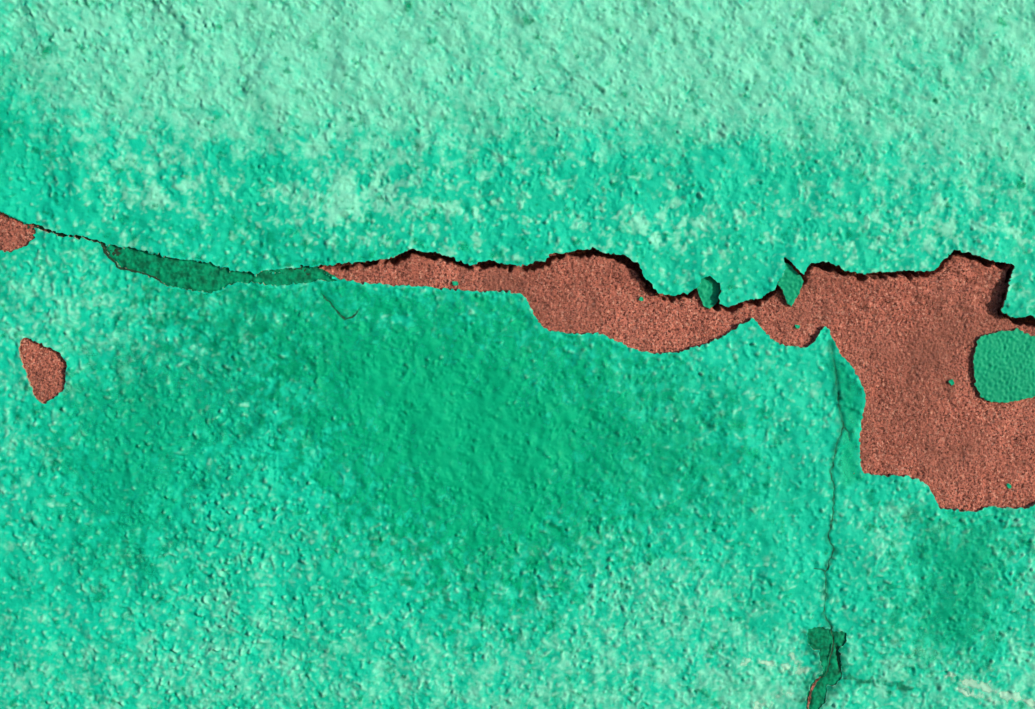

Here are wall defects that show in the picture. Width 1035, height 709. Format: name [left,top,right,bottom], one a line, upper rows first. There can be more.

peeling [0,212,51,252]
crack [27,223,166,285]
peeling [20,338,67,404]
peeling [104,244,1035,512]
crack [807,349,850,709]